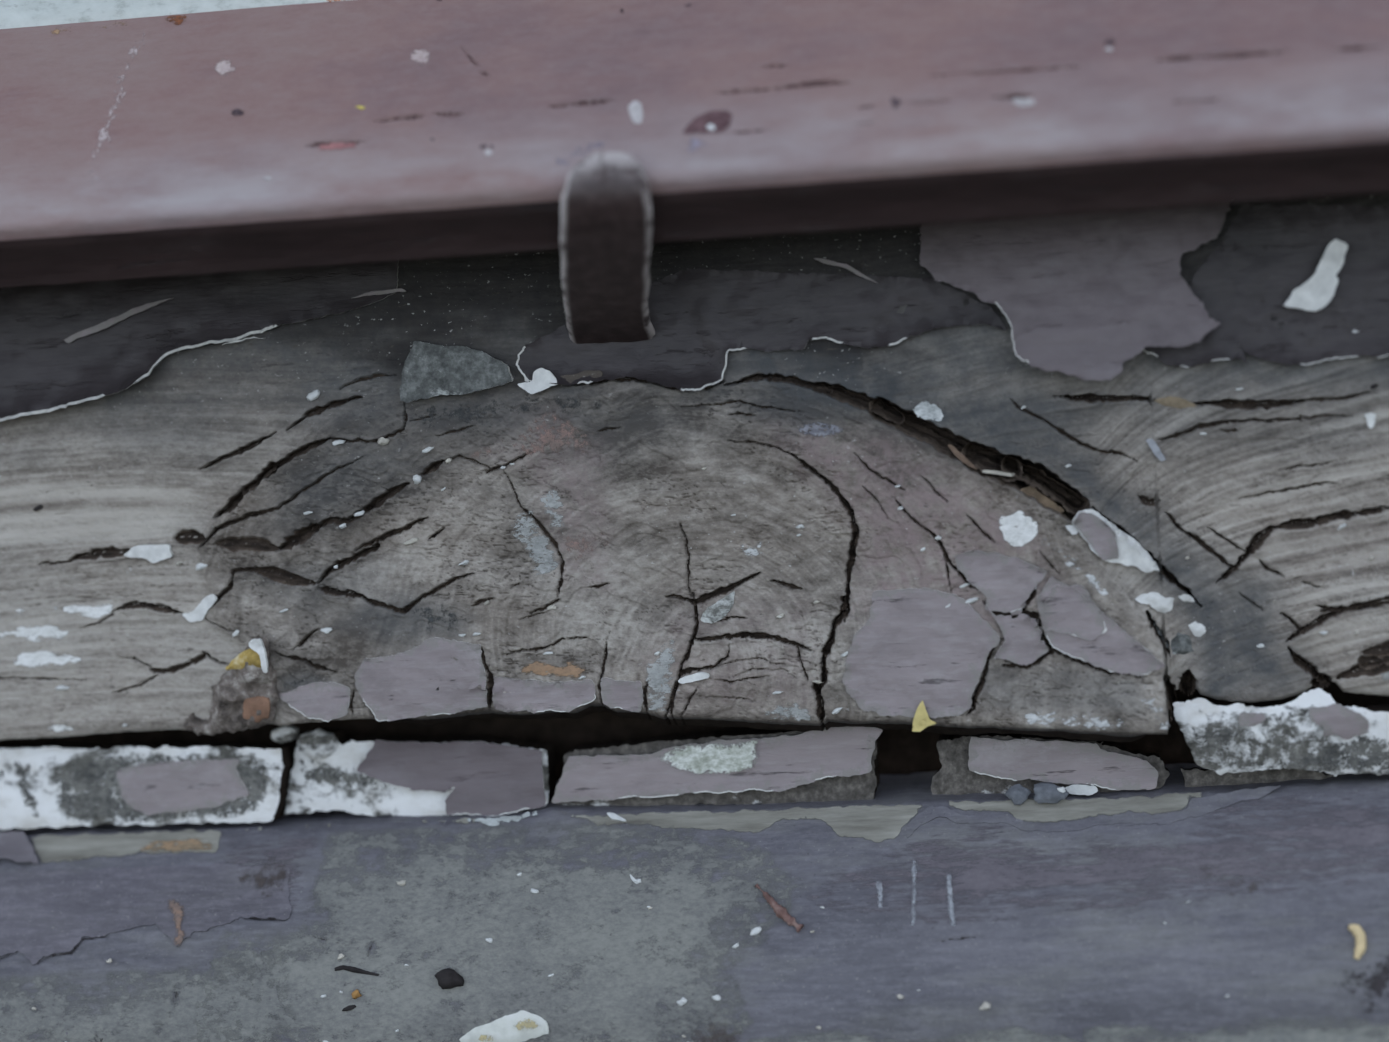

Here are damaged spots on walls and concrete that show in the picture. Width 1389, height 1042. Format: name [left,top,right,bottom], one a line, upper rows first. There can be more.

peeling [400,203,1389,403]
peeling [0,261,406,422]
peeling [913,400,944,421]
crack [41,546,130,566]
crack [84,374,608,713]
crack [567,374,1389,723]
peeling [1072,509,1159,572]
crack [0,675,82,683]
peeling [1309,704,1369,740]
peeling [0,550,1281,1042]
crack [45,936,106,960]
peeling [951,1021,1389,1042]